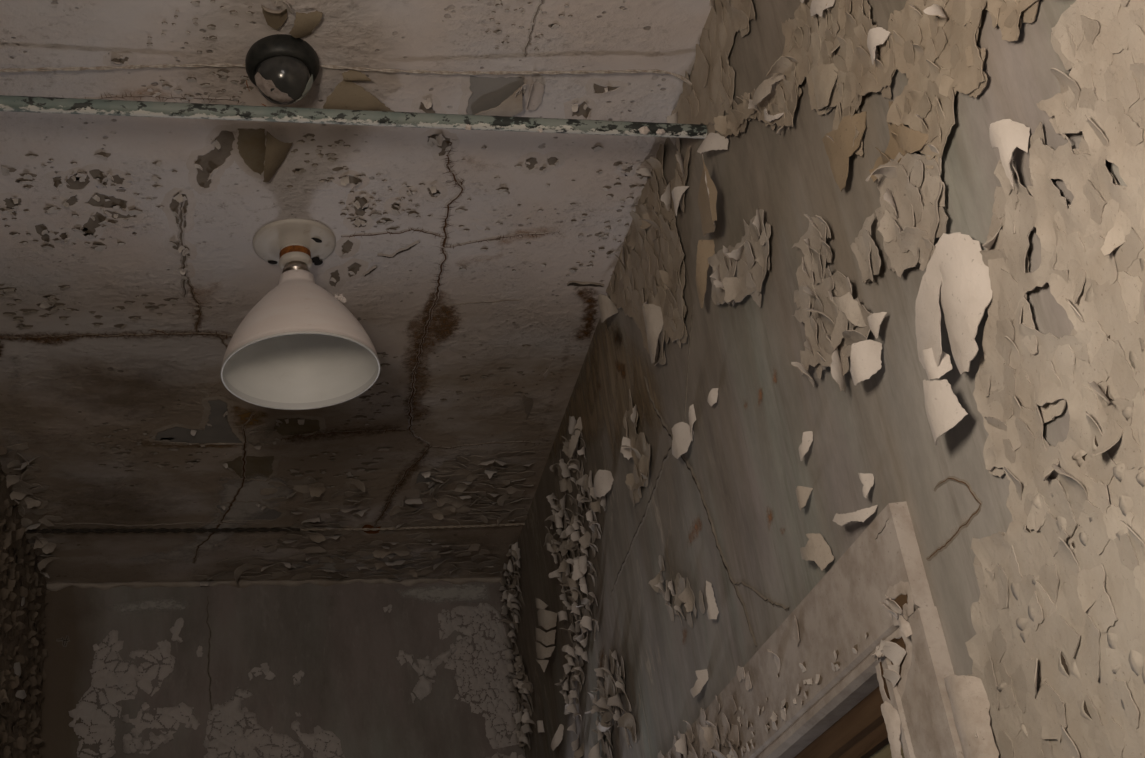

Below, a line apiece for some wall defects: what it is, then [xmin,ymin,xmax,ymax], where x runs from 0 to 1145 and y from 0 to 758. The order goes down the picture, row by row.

crack [523,0,545,57]
crack [0,201,233,349]
peeling [0,123,448,290]
crack [281,139,560,527]
peeling [515,151,566,187]
peeling [563,0,1145,758]
crack [53,413,264,564]
peeling [499,389,650,758]